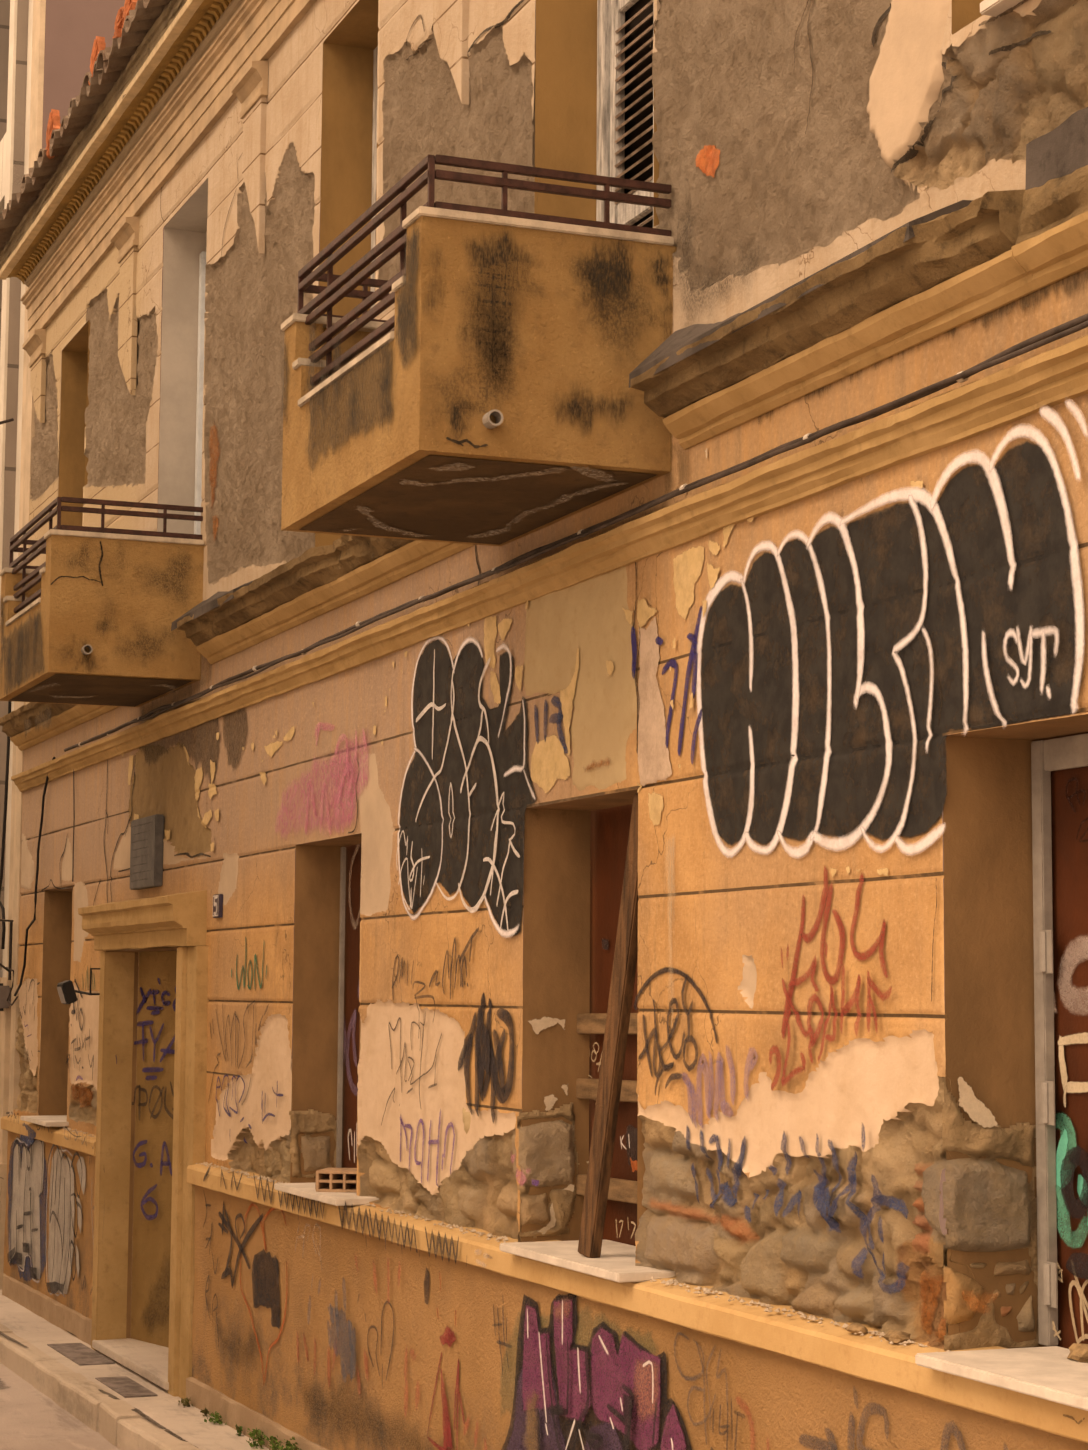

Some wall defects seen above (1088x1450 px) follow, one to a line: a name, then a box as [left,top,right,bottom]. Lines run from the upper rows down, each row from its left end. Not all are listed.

flaking render [378,24,539,281]
flaking render [652,0,1088,291]
crack [891,62,956,172]
crack [978,0,1051,55]
flaking render [204,141,319,585]
water stain [307,230,419,466]
water stain [451,233,529,432]
water stain [562,395,626,428]
water stain [583,243,635,336]
water stain [0,599,56,695]
peeling [357,999,580,1242]
flaking render [635,1029,1039,1351]